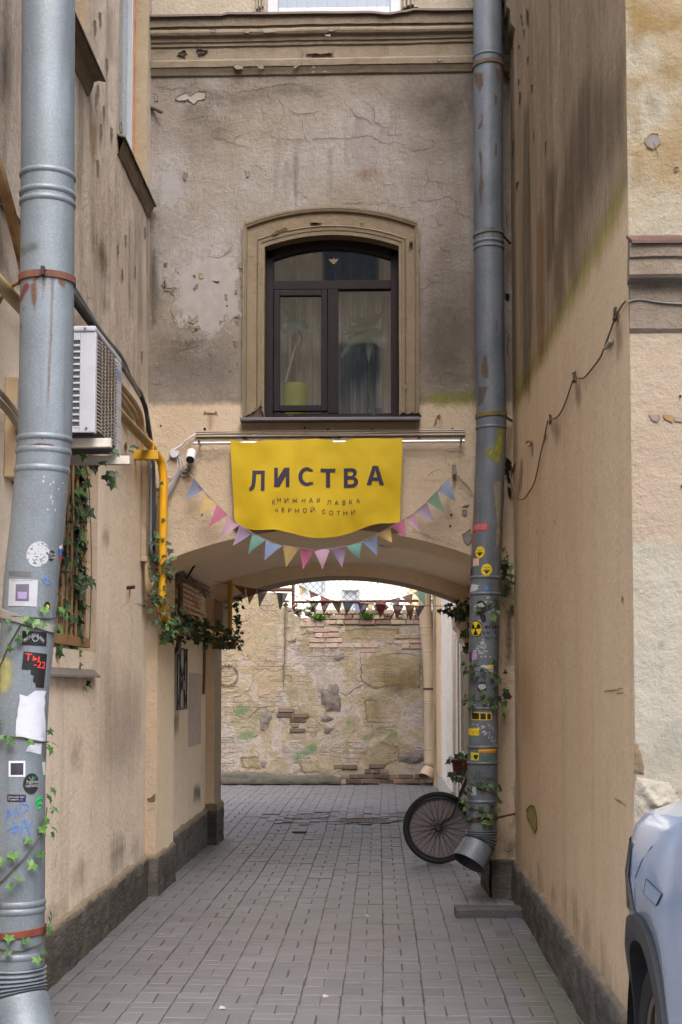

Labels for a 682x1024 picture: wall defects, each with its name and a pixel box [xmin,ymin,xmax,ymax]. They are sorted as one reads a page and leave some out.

peeling [177,49,208,58]
peeling [175,91,206,105]
peeling [644,132,661,150]
crack [153,82,464,251]
peeling [161,280,201,332]
peeling [219,262,243,326]
peeling [648,414,682,423]
flaking render [259,684,341,739]
spalling [634,744,644,775]